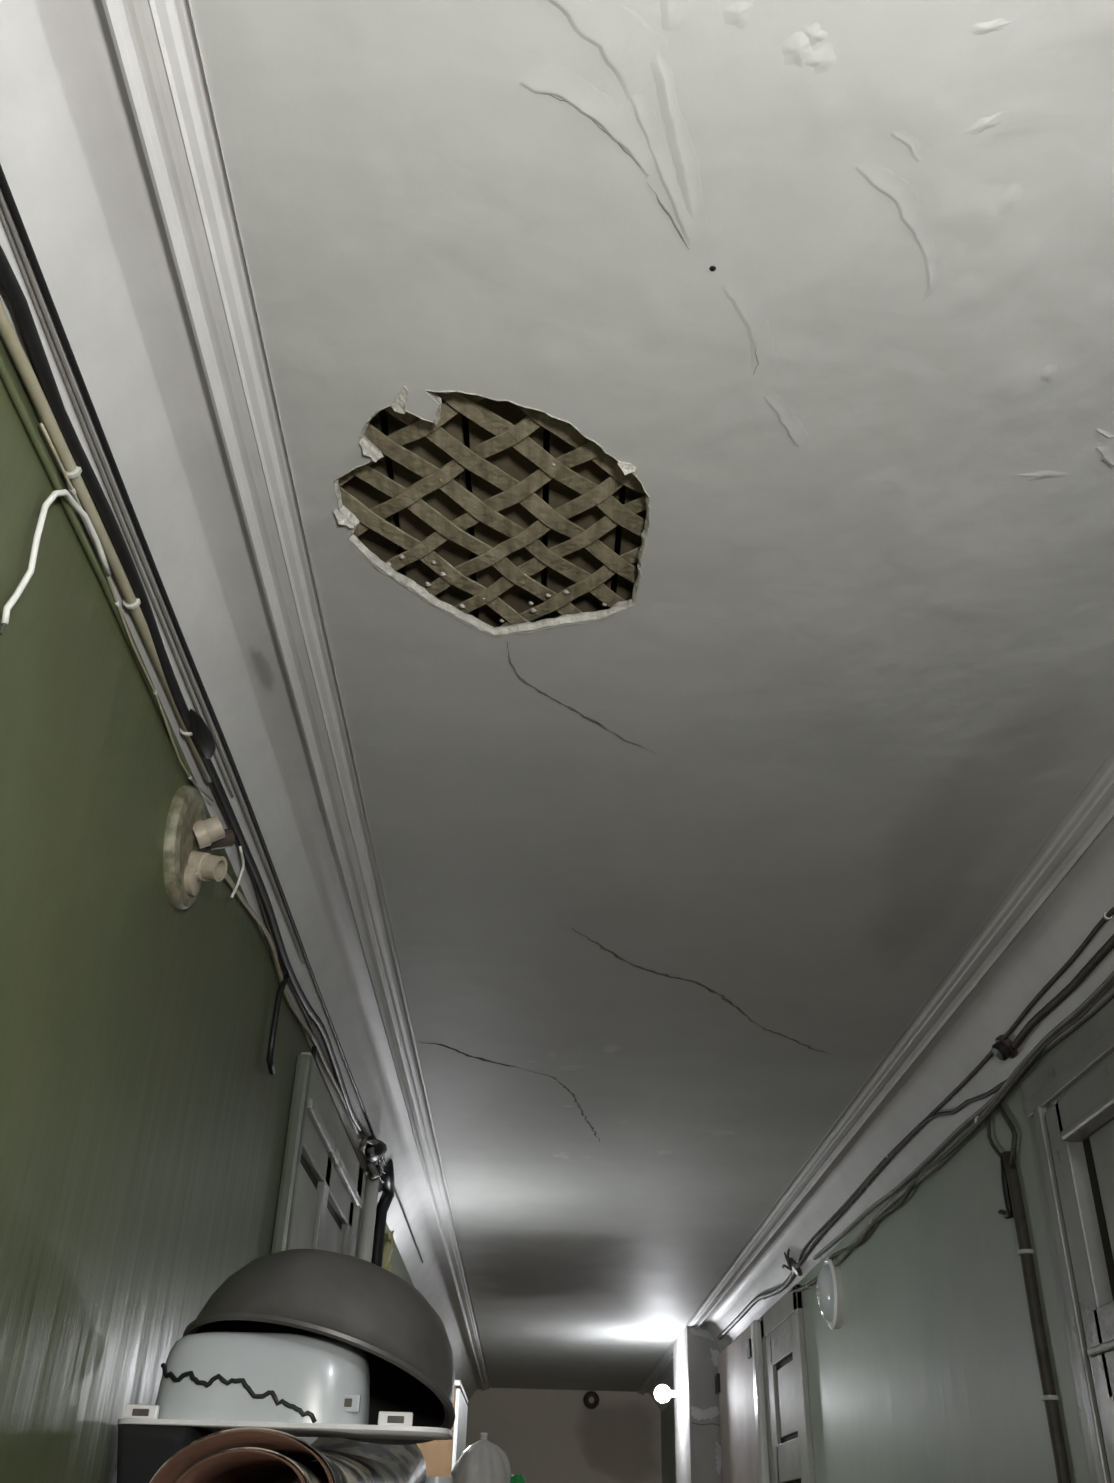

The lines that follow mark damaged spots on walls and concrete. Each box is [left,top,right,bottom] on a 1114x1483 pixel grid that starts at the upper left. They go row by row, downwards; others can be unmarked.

spalling [1095,428,1114,468]
spalling [333,386,651,637]
crack [507,642,655,753]
crack [572,928,830,1055]
crack [420,1042,601,1143]